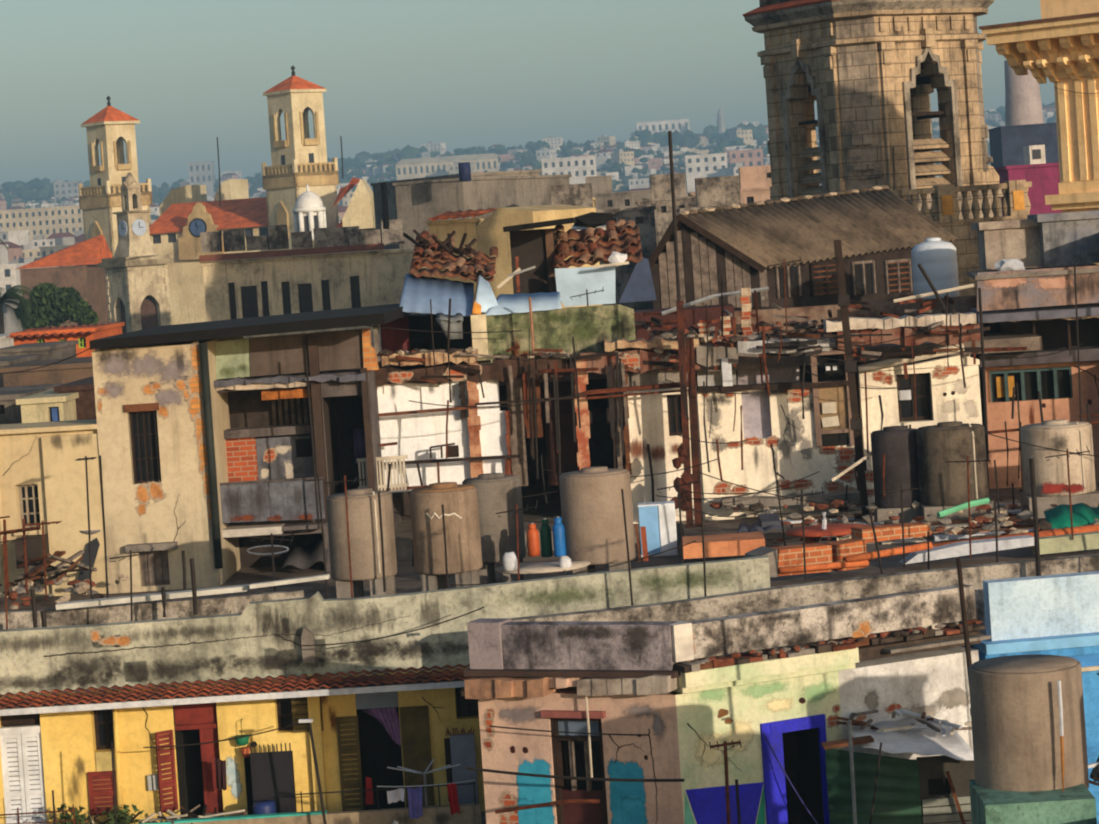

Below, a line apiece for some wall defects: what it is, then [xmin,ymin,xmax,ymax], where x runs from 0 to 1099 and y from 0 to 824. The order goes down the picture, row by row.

flaking render [97,341,212,526]
flaking render [702,388,874,497]
water stain [938,596,976,620]
water stain [3,639,55,649]
water stain [156,629,213,637]
water stain [234,612,469,670]
water stain [788,635,810,646]
water stain [0,658,222,690]
peeling [694,689,754,767]